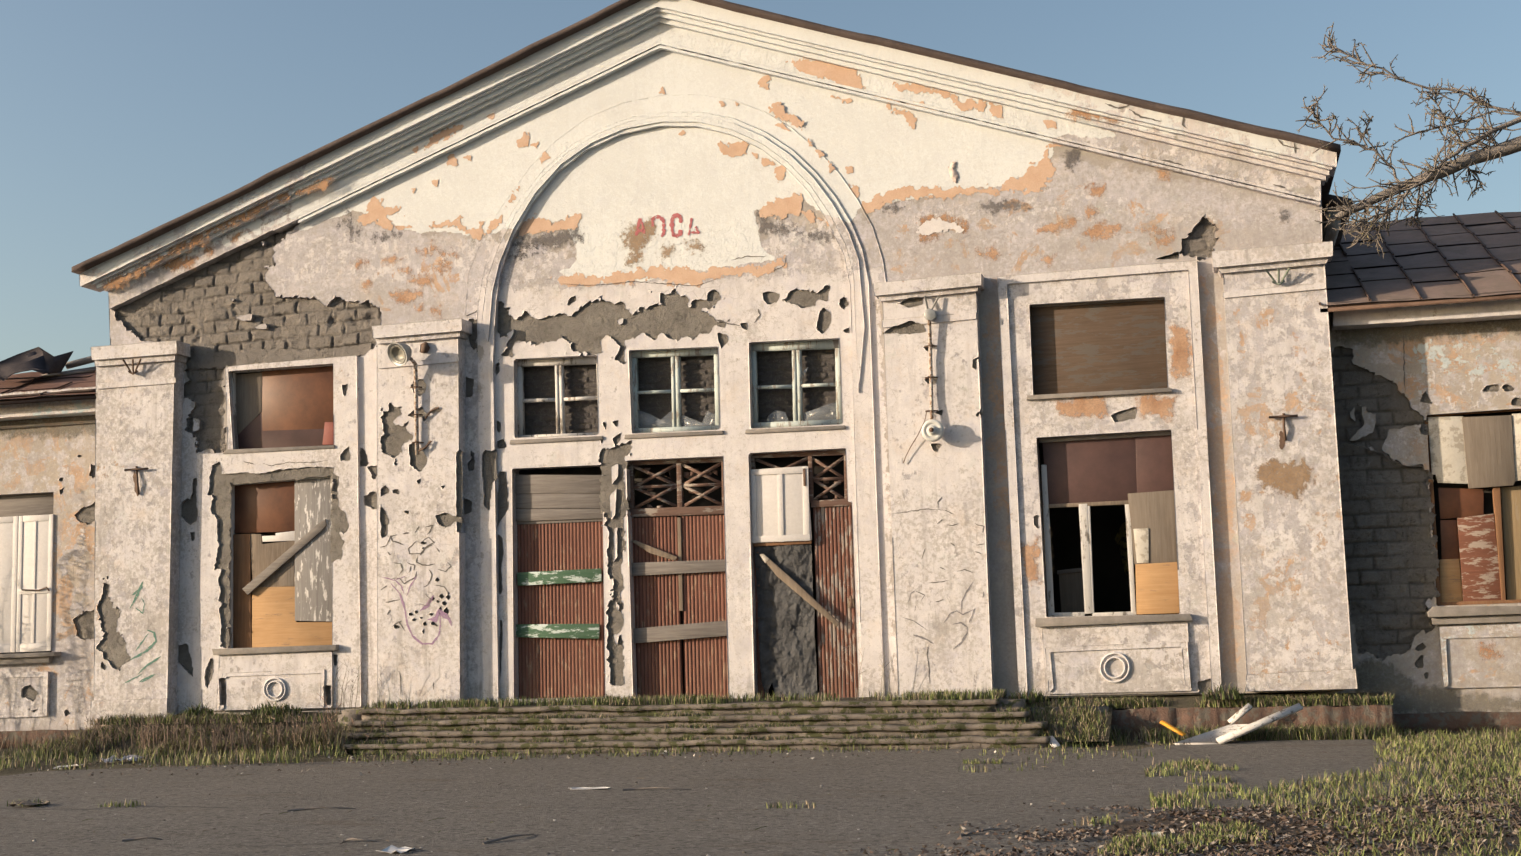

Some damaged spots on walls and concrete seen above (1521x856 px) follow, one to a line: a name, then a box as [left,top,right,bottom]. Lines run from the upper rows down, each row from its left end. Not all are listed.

peeling [785,58,1003,129]
peeling [758,75,1061,236]
flaking render [496,218,849,374]
flaking render [1161,217,1217,261]
flaking render [75,503,95,524]
flaking render [74,583,131,669]
flaking render [114,224,441,705]
flaking render [395,578,450,632]
flaking render [436,421,509,594]
flaking render [599,421,632,686]
flaking render [1111,407,1136,422]
flaking render [1332,347,1440,679]